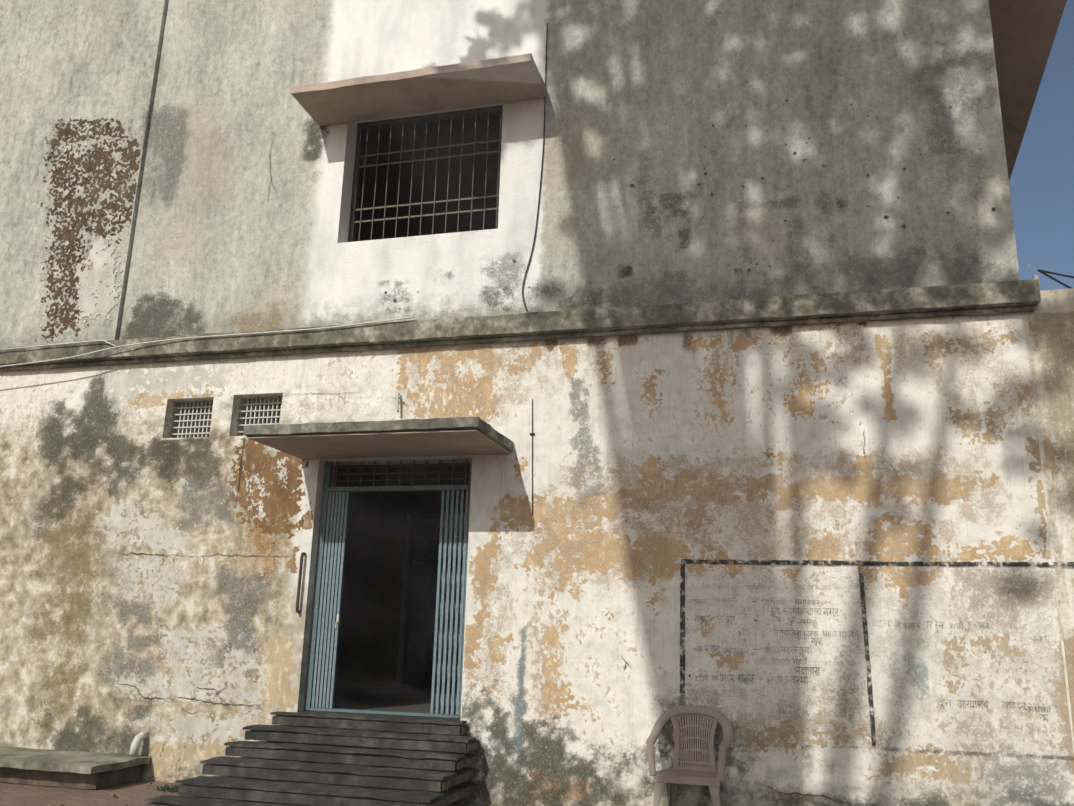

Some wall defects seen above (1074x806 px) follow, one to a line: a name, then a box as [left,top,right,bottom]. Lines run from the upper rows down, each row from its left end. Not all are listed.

peeling [75,224,123,323]
water stain [123,294,205,339]
peeling [396,340,578,423]
peeling [682,332,831,427]
peeling [225,438,313,577]
water stain [35,377,232,754]
crack [121,553,288,565]
water stain [215,572,269,664]
peeling [464,436,1062,722]
crack [122,684,259,714]
water stain [462,629,765,806]
water stain [988,637,1074,806]